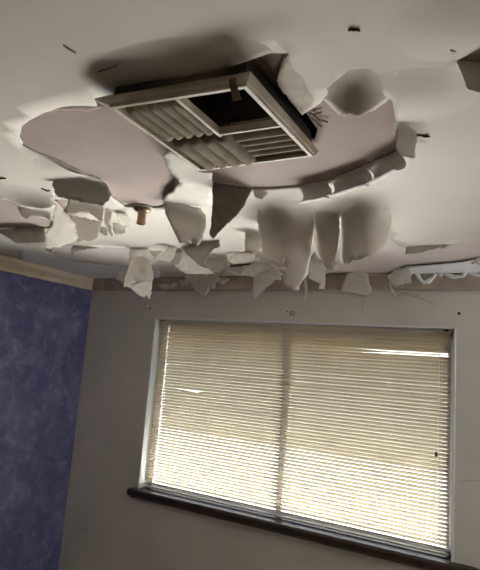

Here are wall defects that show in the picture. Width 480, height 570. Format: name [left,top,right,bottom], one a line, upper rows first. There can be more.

peeling [0,48,480,301]